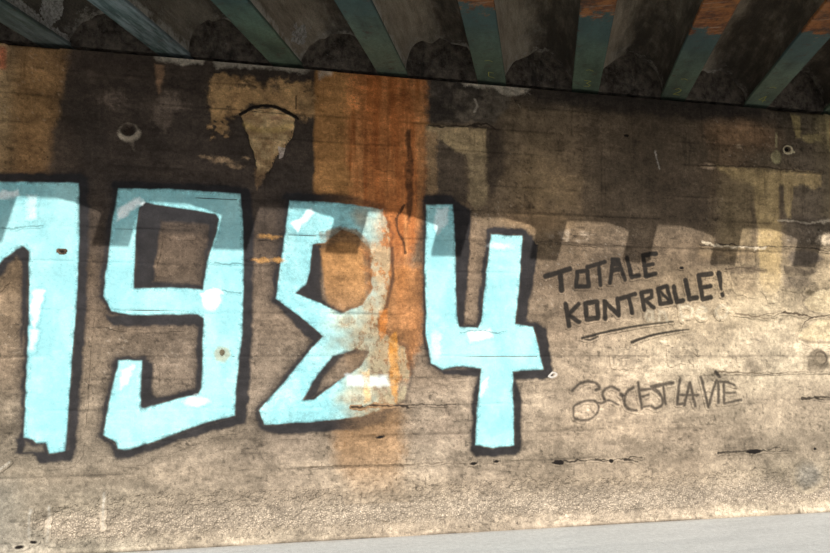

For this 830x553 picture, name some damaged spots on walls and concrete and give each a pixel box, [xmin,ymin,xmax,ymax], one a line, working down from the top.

peeling [192,71,322,194]
rust [310,72,435,407]
crack [733,307,830,333]
rust [323,411,419,505]